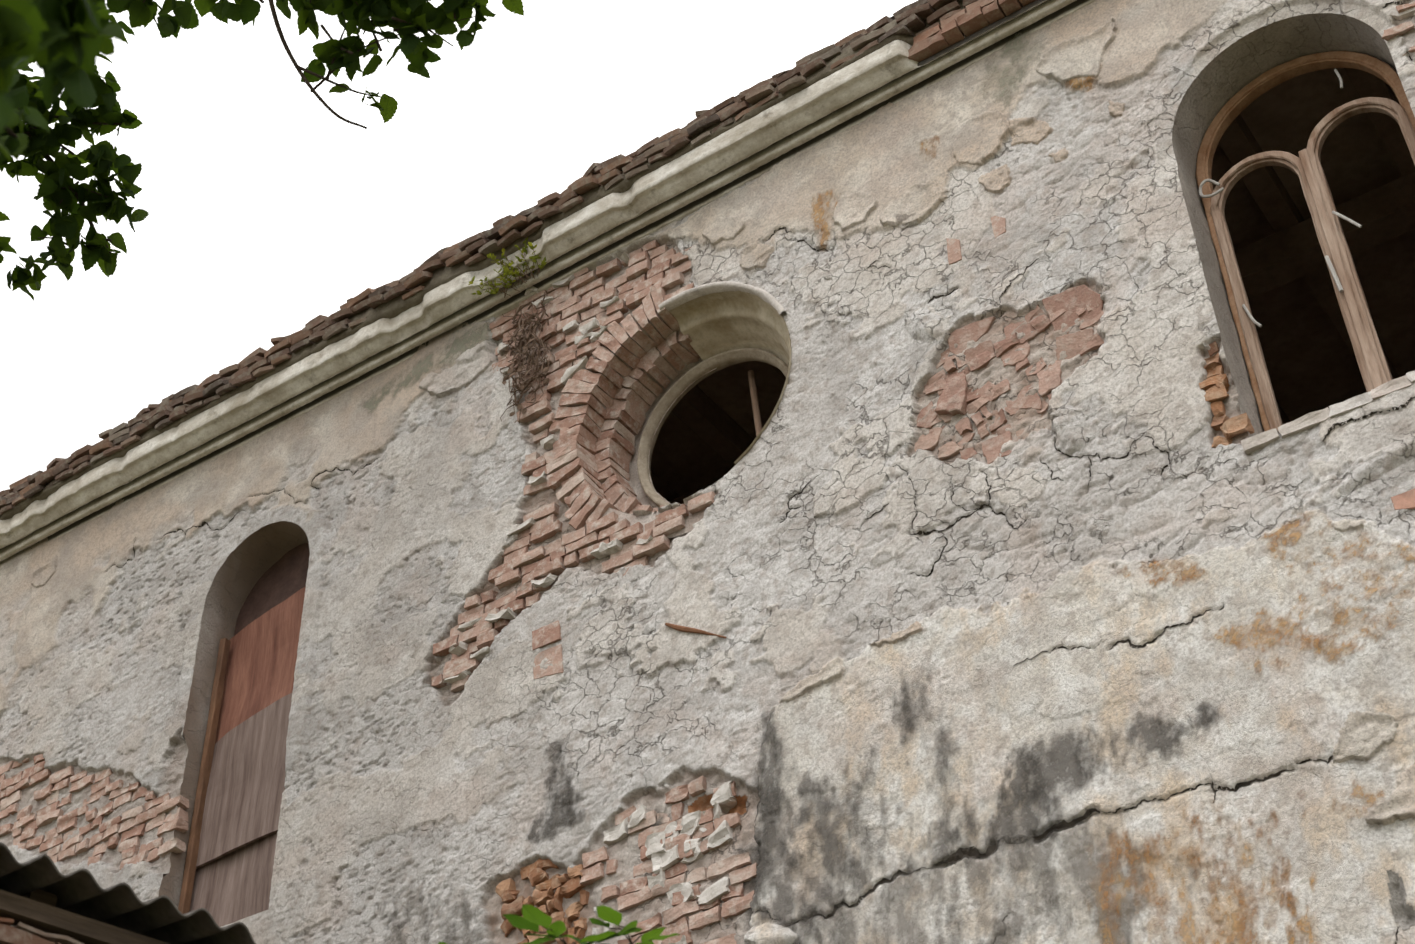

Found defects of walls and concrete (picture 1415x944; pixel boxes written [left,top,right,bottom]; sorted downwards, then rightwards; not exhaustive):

flaking render [419,216,775,693]
crack [928,288,958,303]
crack [867,464,1027,577]
flaking render [904,285,1104,464]
crack [1040,429,1170,494]
flaking render [1199,341,1255,448]
leakage [896,676,929,743]
flaking render [0,753,189,870]
flaking render [495,776,758,944]
leakage [738,714,883,944]
crack [753,755,1333,925]
leakage [881,704,1218,944]